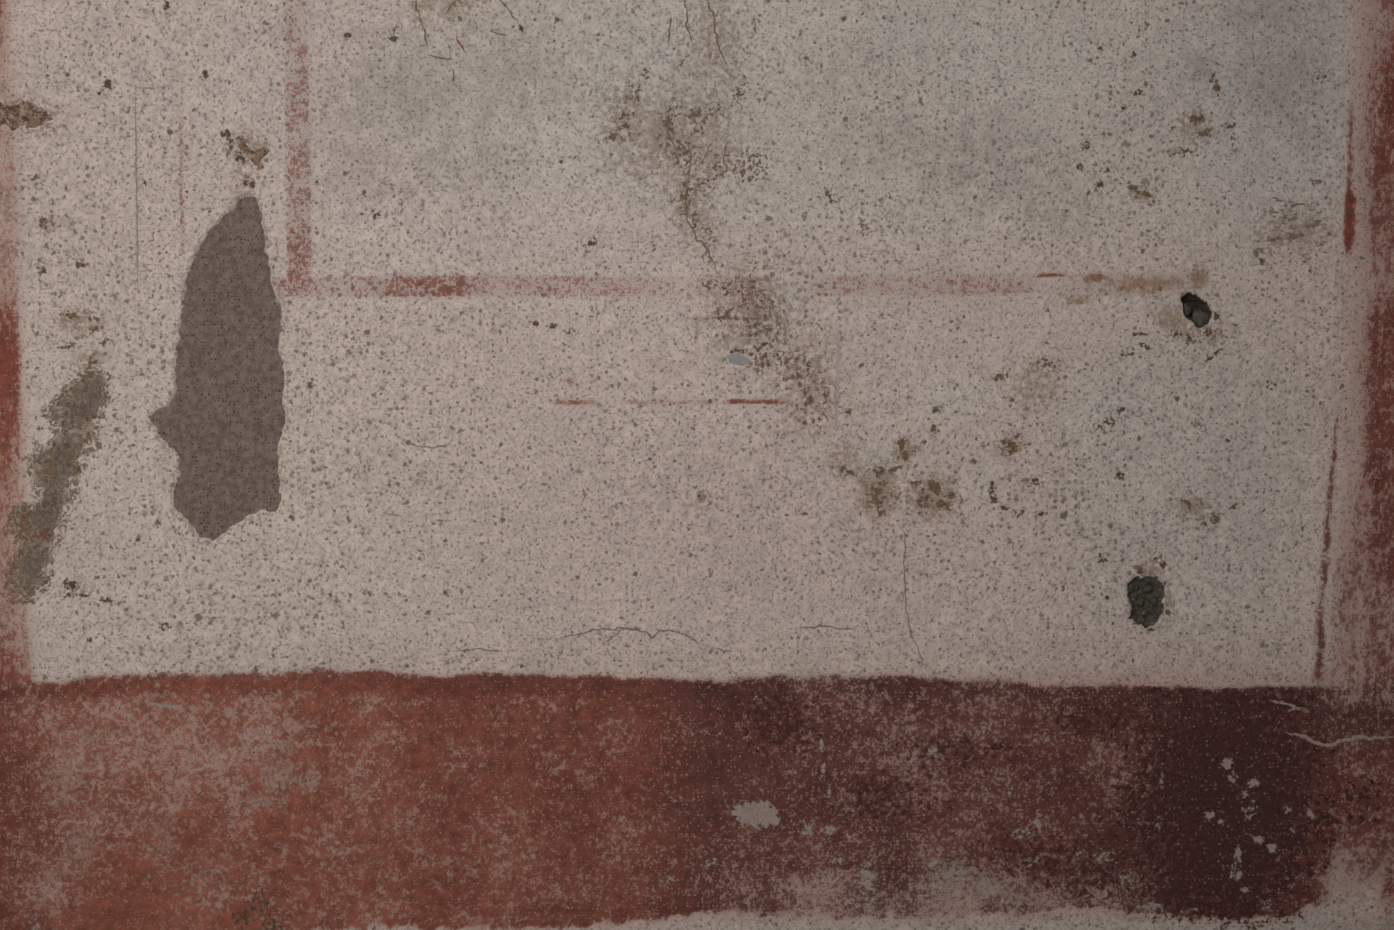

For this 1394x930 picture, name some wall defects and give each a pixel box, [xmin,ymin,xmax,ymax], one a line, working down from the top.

crack [668,0,727,68]
crack [666,130,728,273]
flaking render [146,129,293,546]
spalling [1171,312,1223,364]
crack [456,646,505,654]
crack [555,627,732,652]
crack [797,623,855,631]
peeling [731,799,781,830]